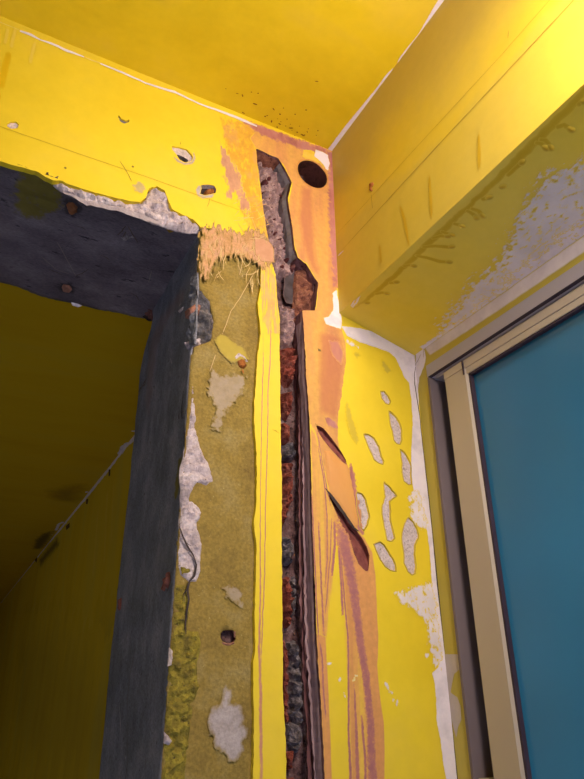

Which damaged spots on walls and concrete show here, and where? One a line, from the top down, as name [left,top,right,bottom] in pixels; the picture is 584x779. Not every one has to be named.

flaking render [53,181,199,234]
flaking render [315,423,419,575]
spalling [380,390,412,485]
flaking render [162,387,213,779]